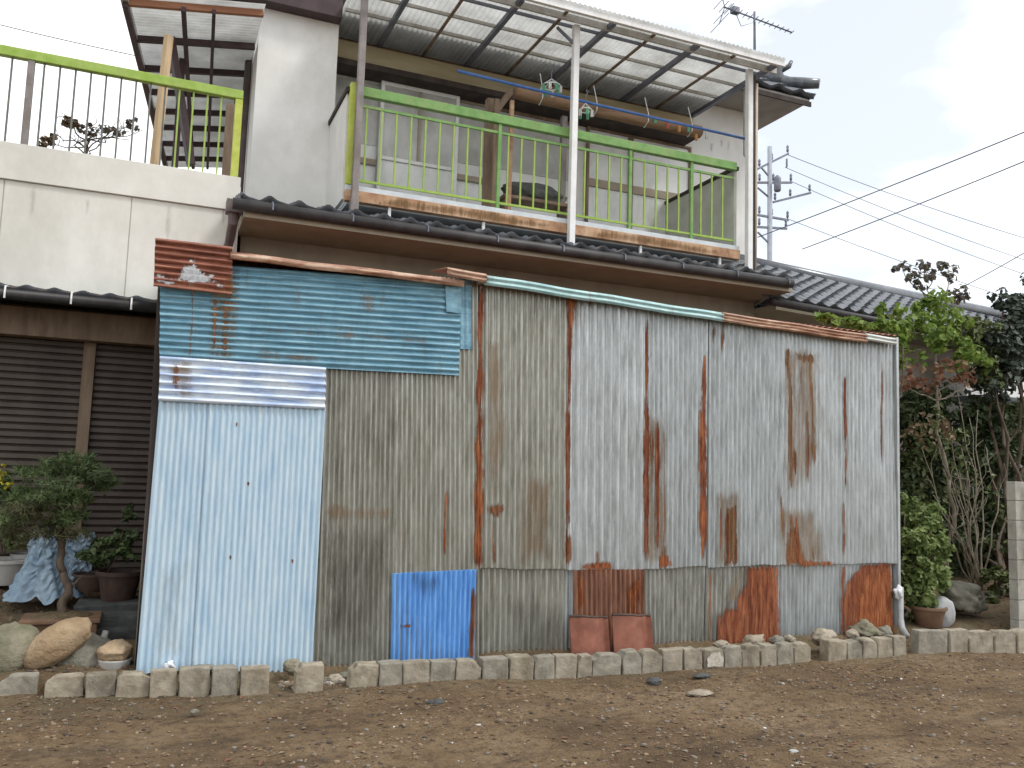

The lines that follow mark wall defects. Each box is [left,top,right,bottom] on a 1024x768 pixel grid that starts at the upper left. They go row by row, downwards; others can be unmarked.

peeling [157,260,223,287]
rust [474,288,504,568]
rust [564,298,576,564]
rust [577,551,612,609]
rust [643,323,672,568]
rust [699,355,708,558]
rust [708,349,894,644]